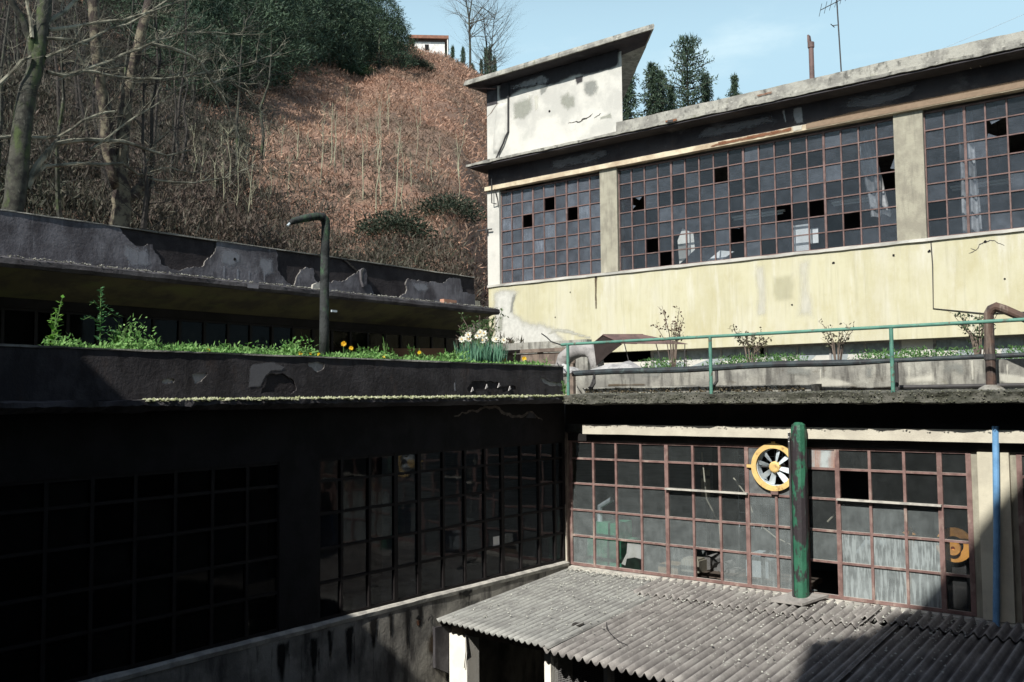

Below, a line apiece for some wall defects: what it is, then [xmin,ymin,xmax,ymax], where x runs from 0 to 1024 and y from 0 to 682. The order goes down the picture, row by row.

damp [515,75,547,118]
damp [576,76,597,95]
spalling [120,228,217,271]
spalling [261,373,297,394]